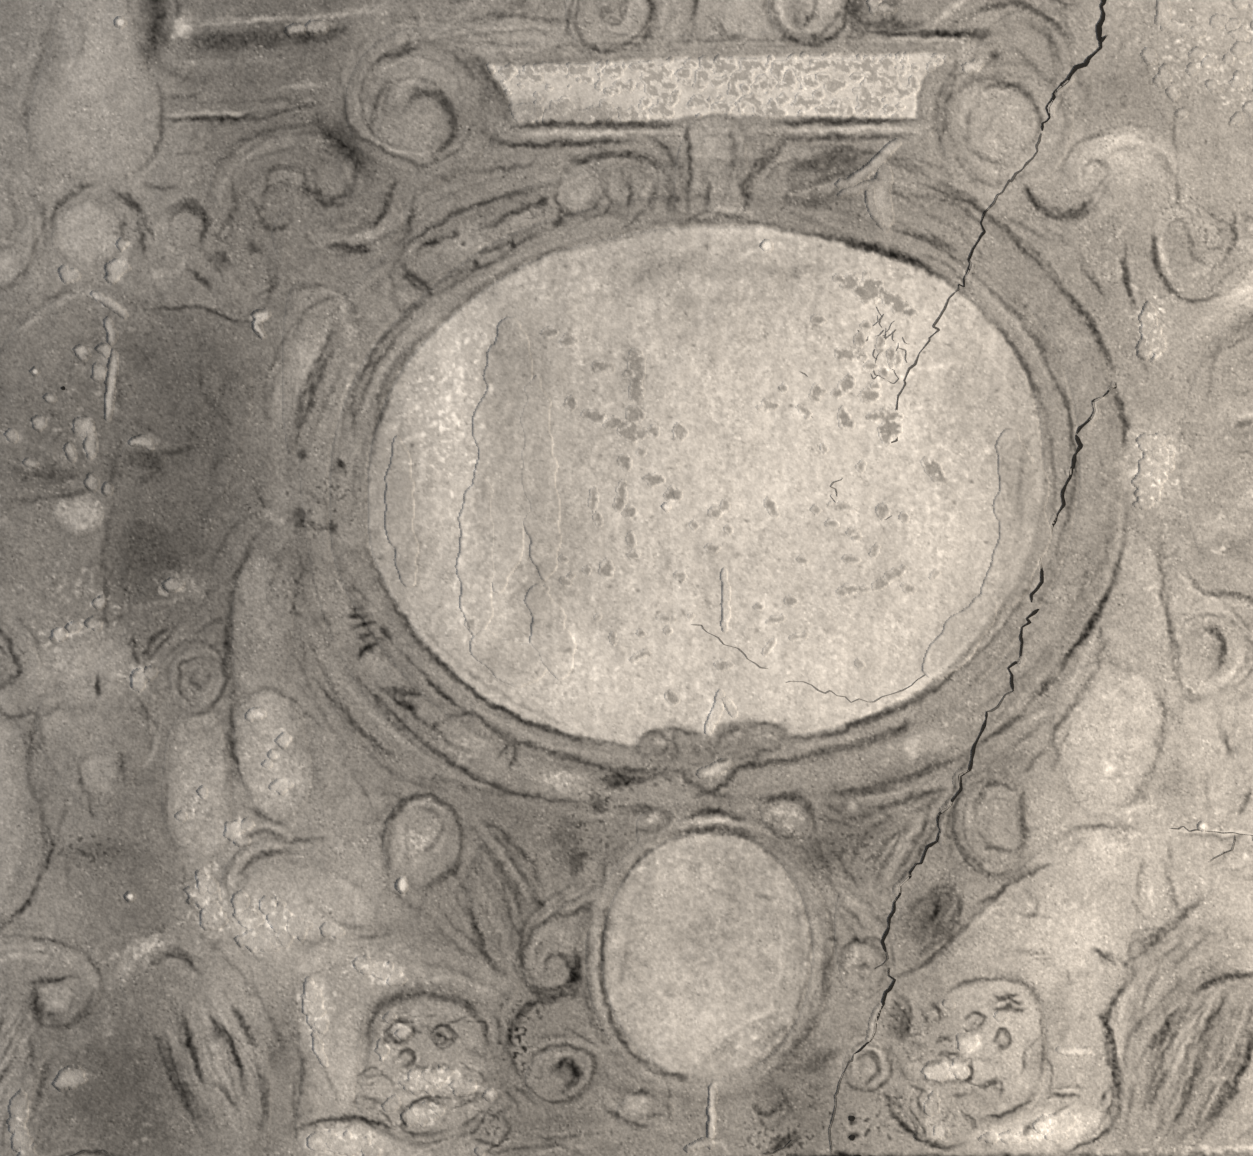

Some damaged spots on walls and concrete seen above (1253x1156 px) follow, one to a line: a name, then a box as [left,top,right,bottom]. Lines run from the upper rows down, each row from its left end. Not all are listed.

peeling [866,0,898,16]
peeling [486,51,985,126]
crack [891,0,1107,443]
peeling [795,270,919,446]
peeling [689,498,734,555]
peeling [763,496,781,518]
peeling [809,478,881,565]
peeling [875,502,910,524]
peeling [920,456,950,485]
crack [1049,381,1117,530]
crack [830,558,1044,1156]
crack [1170,826,1253,862]